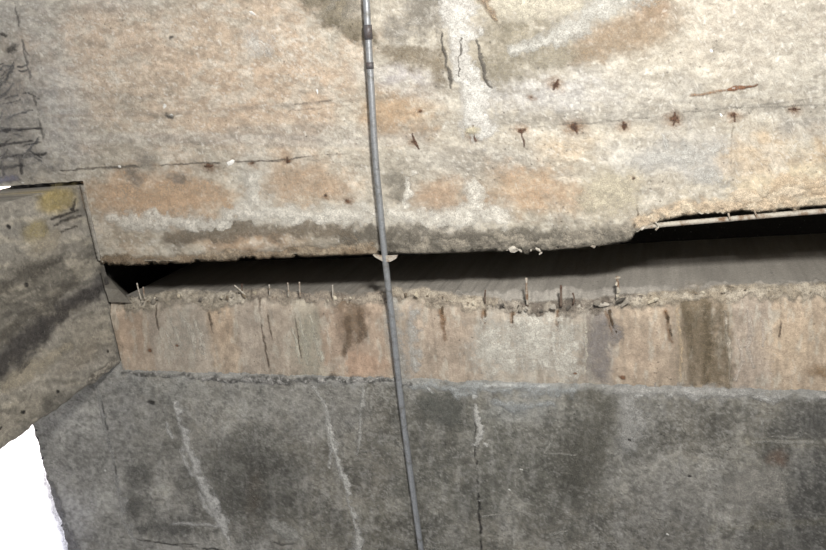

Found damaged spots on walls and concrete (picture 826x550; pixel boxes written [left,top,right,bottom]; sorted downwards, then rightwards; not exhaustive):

water stain [303,0,376,43]
crack [441,33,491,88]
water stain [479,0,662,81]
rust [691,84,758,96]
crack [60,164,139,172]
crack [161,157,301,166]
spalling [387,173,826,253]
spalling [100,242,377,265]
spalling [124,282,826,317]
water stain [386,297,622,446]
water stain [313,386,365,550]
crack [476,482,484,550]